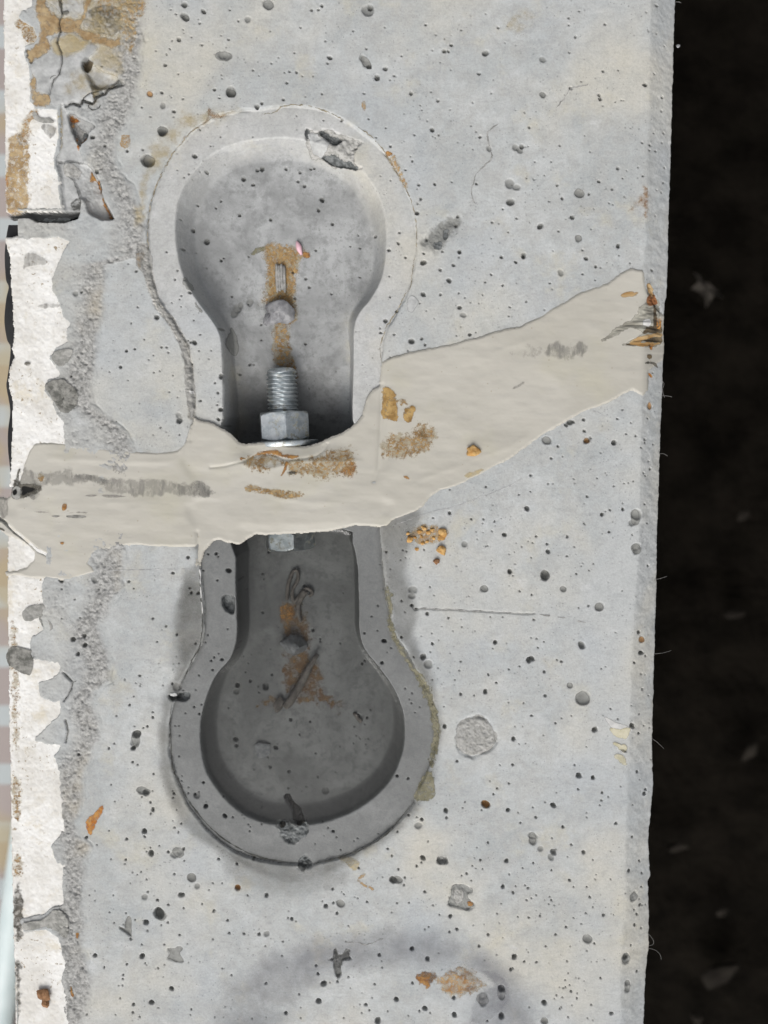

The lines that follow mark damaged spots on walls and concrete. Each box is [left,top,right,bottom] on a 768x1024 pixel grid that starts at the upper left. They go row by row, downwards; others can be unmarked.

crack [50,4,123,111]
spalling [30,0,122,220]
spalling [305,129,362,171]
rust [251,244,310,379]
spalling [601,283,662,368]
rust [240,450,356,479]
rust [245,485,304,499]
rust [280,603,339,706]
rust [86,806,103,835]
spalling [120,916,132,937]
rust [416,967,486,996]